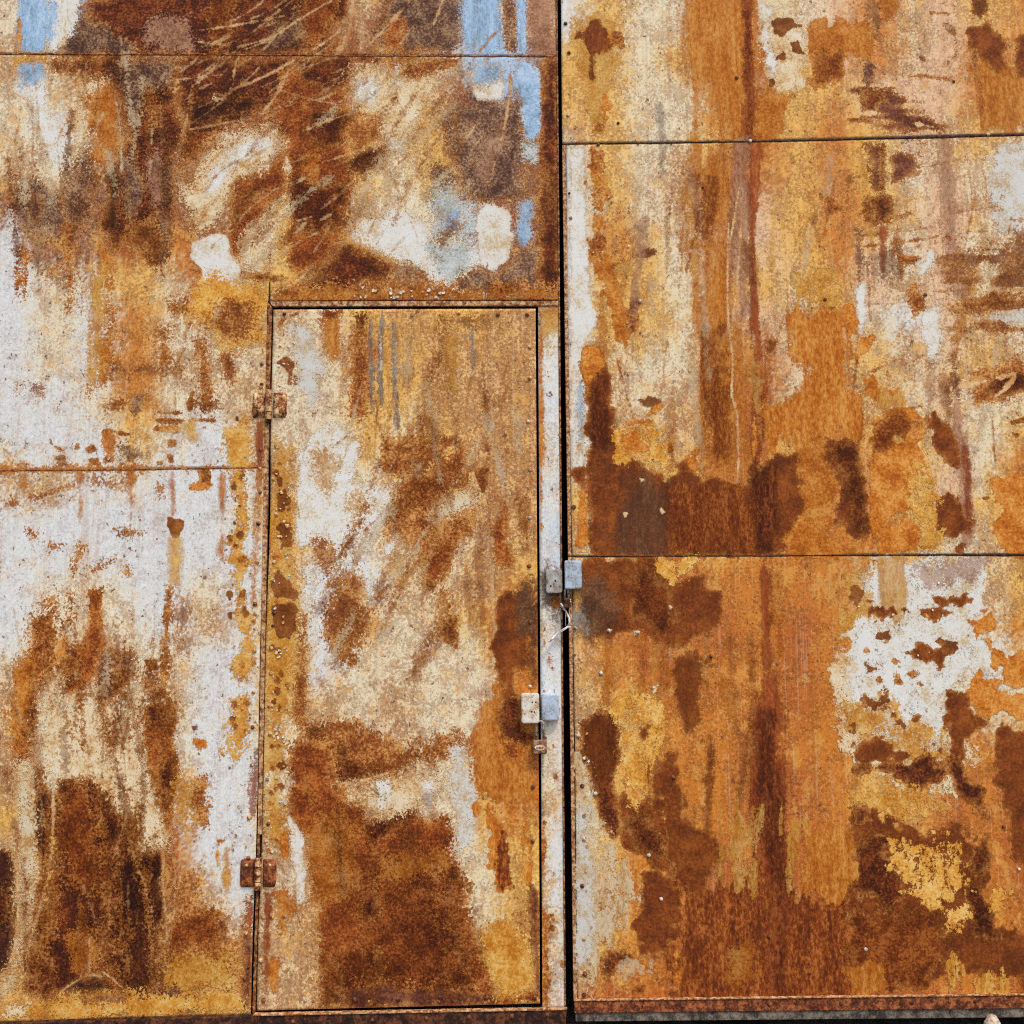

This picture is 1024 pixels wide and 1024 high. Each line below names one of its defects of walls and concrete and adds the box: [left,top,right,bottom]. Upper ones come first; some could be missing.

rust [0,421,561,1021]
rust [0,0,626,515]
rust [560,0,1024,998]
peeling [824,544,999,800]